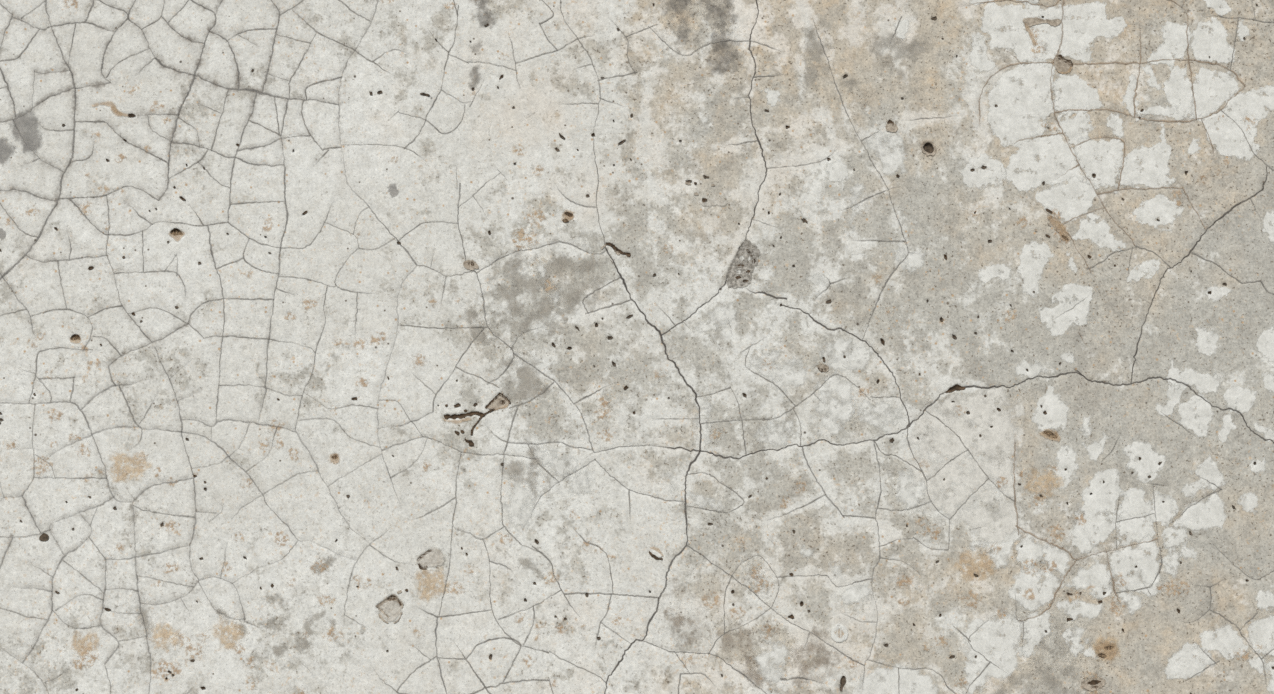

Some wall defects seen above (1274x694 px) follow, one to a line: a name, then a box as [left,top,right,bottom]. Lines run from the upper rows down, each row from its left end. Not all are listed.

water stain [709,5,736,71]
spalling [726,240,760,288]
peeling [866,132,906,175]
spalling [920,140,936,156]
peeling [961,0,1274,336]
crack [964,0,1274,443]
crack [342,26,1162,694]
peeling [1155,326,1274,443]
crack [9,376,248,663]
crack [217,445,296,561]
peeling [750,338,1274,694]
crack [1192,586,1273,678]